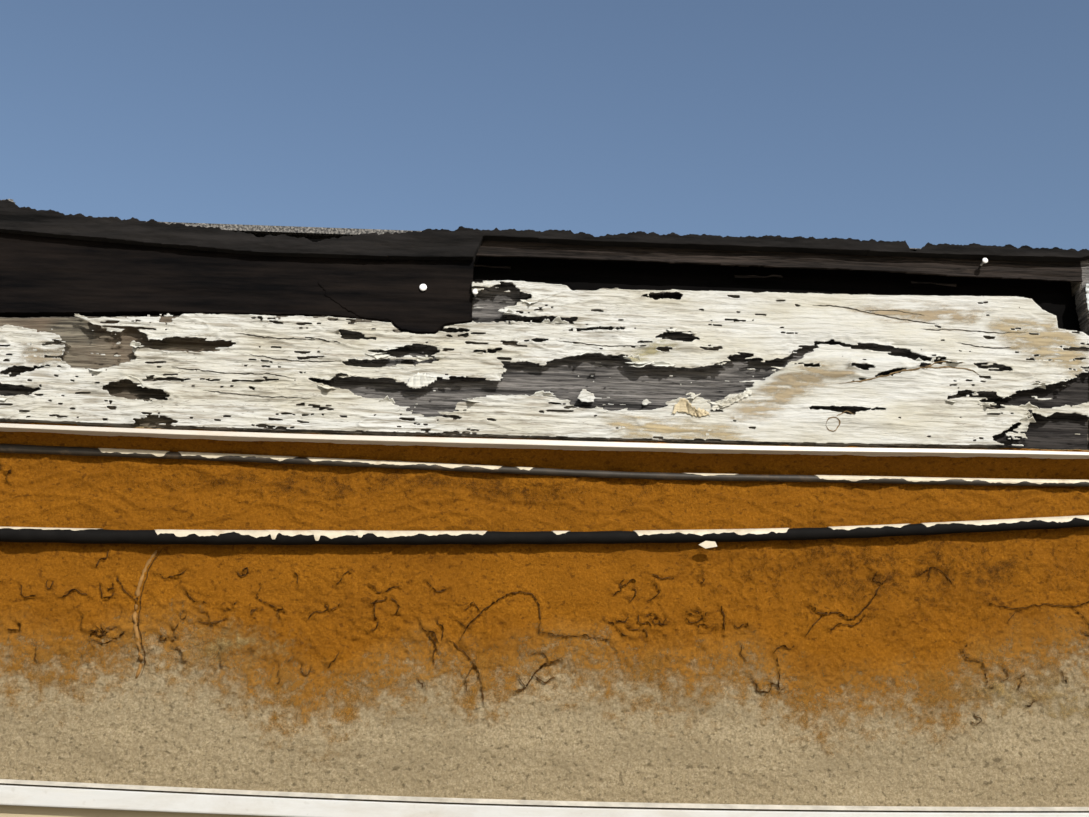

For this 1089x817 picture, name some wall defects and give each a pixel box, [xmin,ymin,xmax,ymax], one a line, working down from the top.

peeling [0,317,236,427]
peeling [444,282,636,337]
peeling [309,330,820,417]
peeling [655,327,699,342]
peeling [974,363,1012,371]
peeling [946,371,1089,450]
crack [0,551,135,644]
crack [159,567,349,662]
crack [277,652,339,684]
crack [370,572,887,701]
crack [962,644,1036,707]
crack [989,601,1089,636]